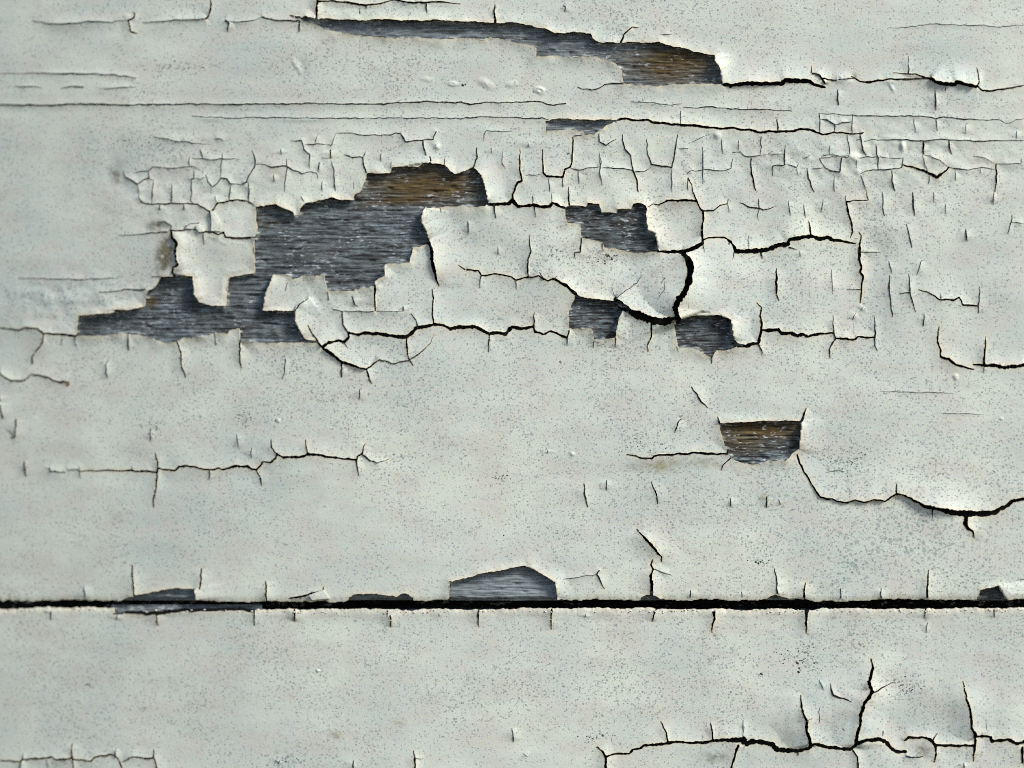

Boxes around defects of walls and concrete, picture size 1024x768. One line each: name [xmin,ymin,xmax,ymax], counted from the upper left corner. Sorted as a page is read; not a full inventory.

peeling [299,16,729,87]
peeling [77,160,768,368]
crack [0,56,1024,399]
crack [24,430,388,507]
peeling [719,416,804,464]
crack [796,454,1024,537]
peeling [111,588,338,614]
peeling [349,565,563,614]
crack [597,658,1024,768]